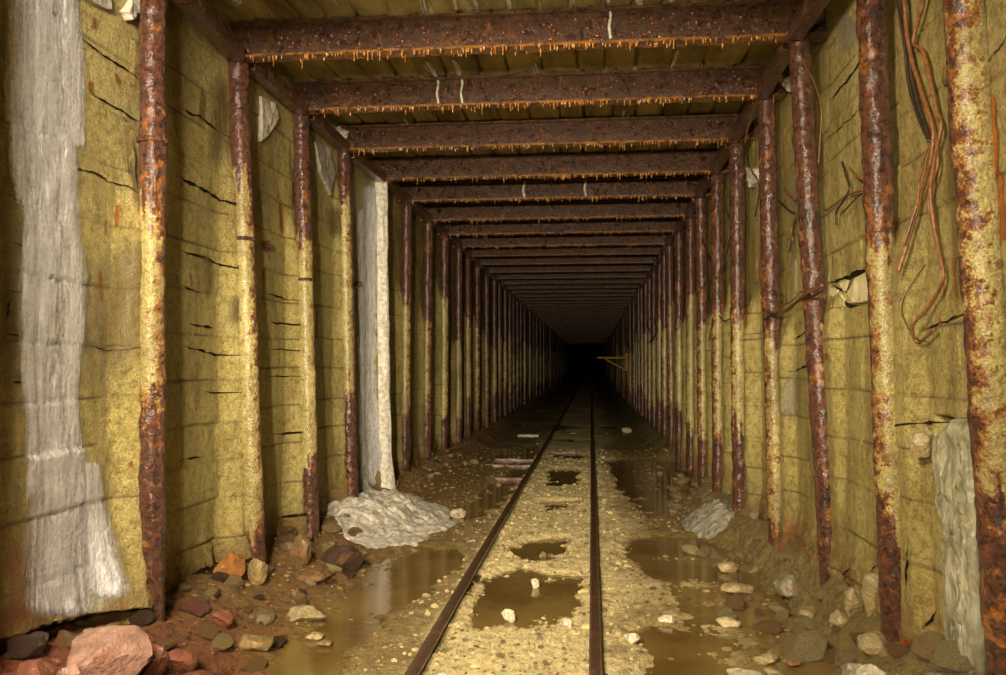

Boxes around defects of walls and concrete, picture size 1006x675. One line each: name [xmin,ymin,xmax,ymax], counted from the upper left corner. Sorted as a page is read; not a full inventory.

crack [82,38,138,79]
rust [244,6,791,68]
crack [89,92,139,122]
rust [302,72,761,118]
rust [991,96,1006,239]
crack [180,176,236,206]
rust [380,140,728,249]
leakage [6,0,142,615]
leakage [320,181,458,549]
crack [894,417,967,427]
leakage [681,499,735,540]